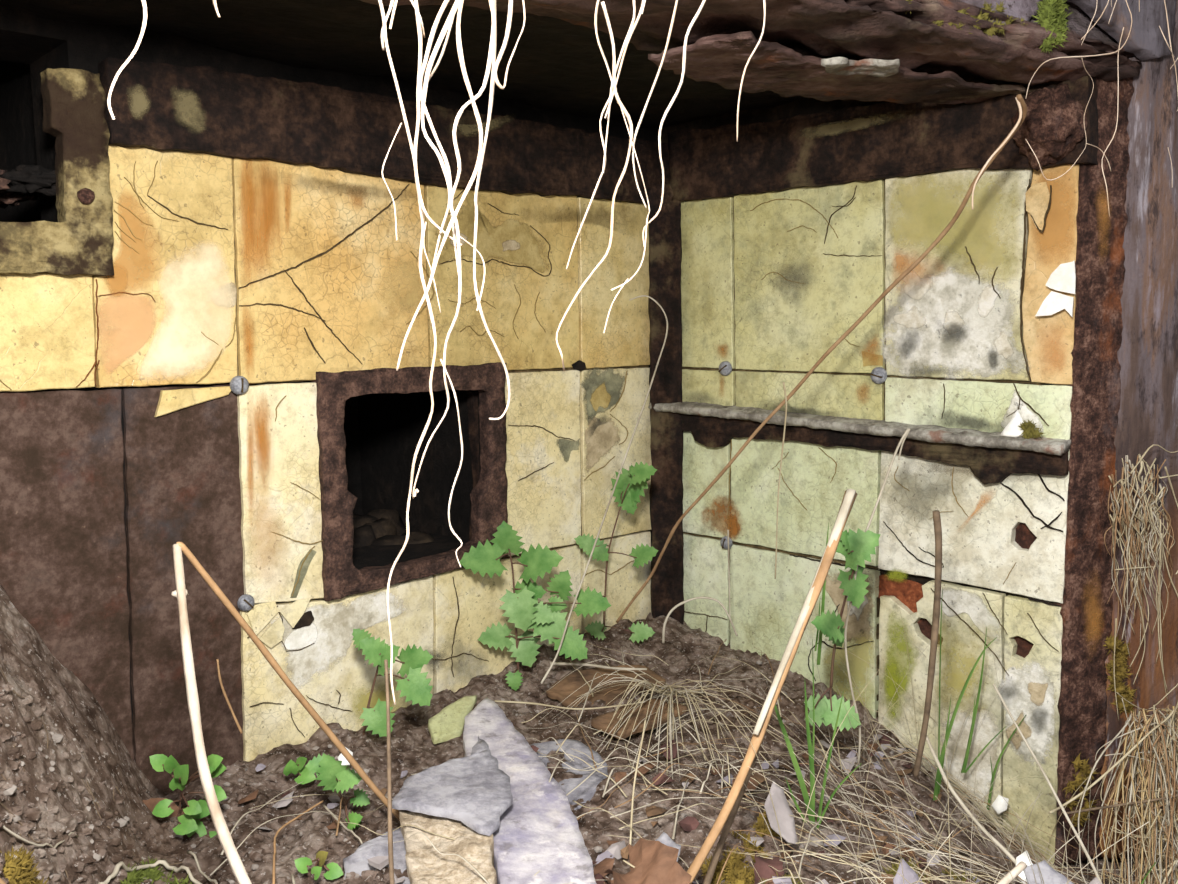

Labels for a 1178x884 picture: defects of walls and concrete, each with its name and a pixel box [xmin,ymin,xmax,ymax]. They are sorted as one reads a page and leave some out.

rust [104,199,153,368]
crack [196,184,409,383]
leakage [946,326,963,338]
crack [965,179,1052,426]
peeling [1035,260,1076,316]
rust [249,423,265,484]
spalling [247,549,404,688]
rust [705,499,741,538]
crack [883,521,1061,676]
hole [1015,523,1037,549]
crack [1000,474,1065,532]
peeling [943,636,1054,806]